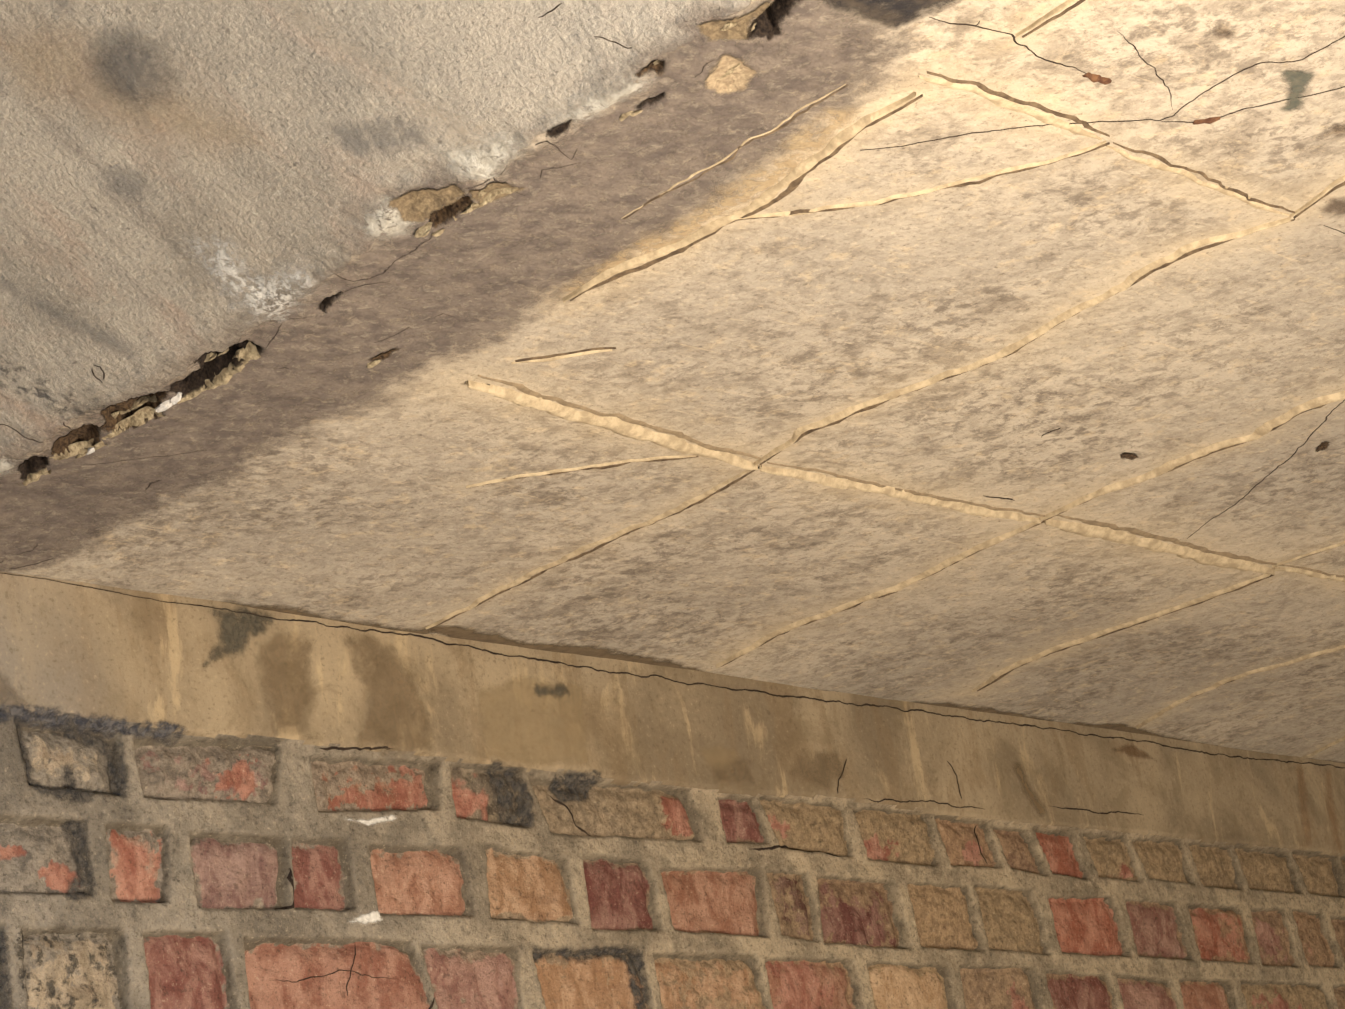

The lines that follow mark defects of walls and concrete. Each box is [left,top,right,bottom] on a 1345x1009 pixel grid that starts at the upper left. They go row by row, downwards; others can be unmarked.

spalling [546,119,572,138]
peeling [699,0,800,94]
crack [930,17,1087,74]
crack [860,31,1345,151]
spalling [389,182,524,238]
damp [0,0,952,571]
spalling [17,340,262,486]
crack [1187,399,1345,539]
damp [0,676,184,803]
damp [205,603,699,749]
crack [1,546,1345,768]
damp [359,815,396,825]